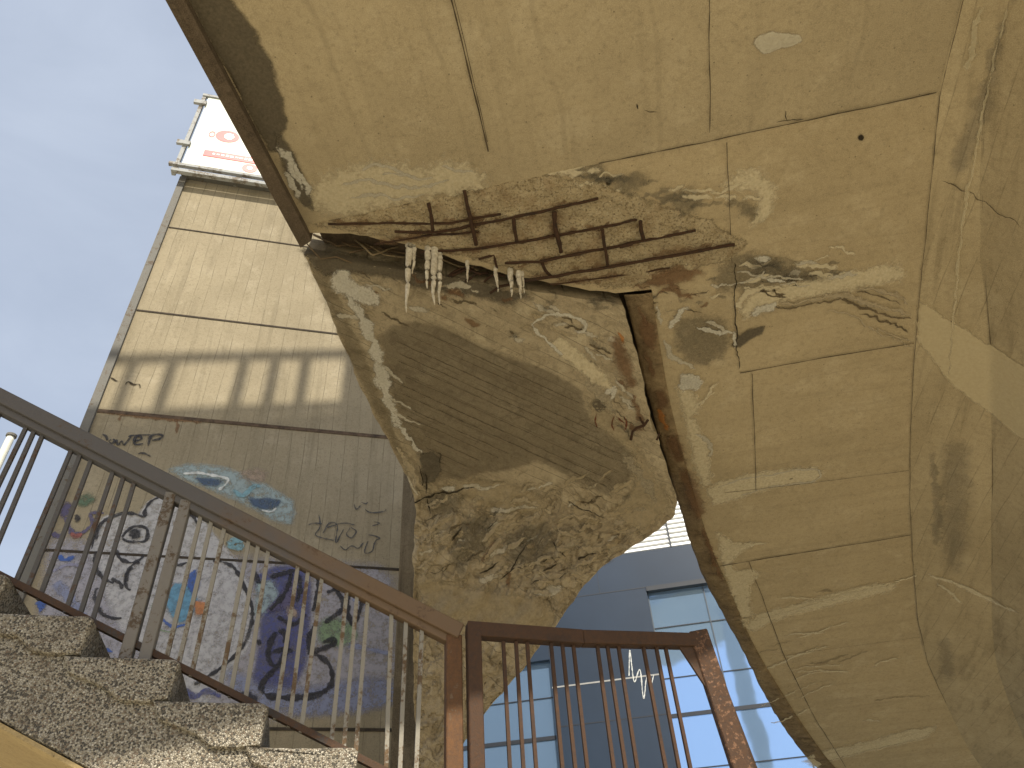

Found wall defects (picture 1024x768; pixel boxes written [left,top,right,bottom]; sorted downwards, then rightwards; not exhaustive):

peeling [754,31,802,54]
damp [189,0,487,216]
spalling [315,174,747,294]
damp [668,168,777,224]
damp [301,248,526,453]
damp [510,304,641,431]
crack [732,264,740,368]
damp [634,246,904,504]
crack [410,486,474,513]
peeling [396,447,645,627]